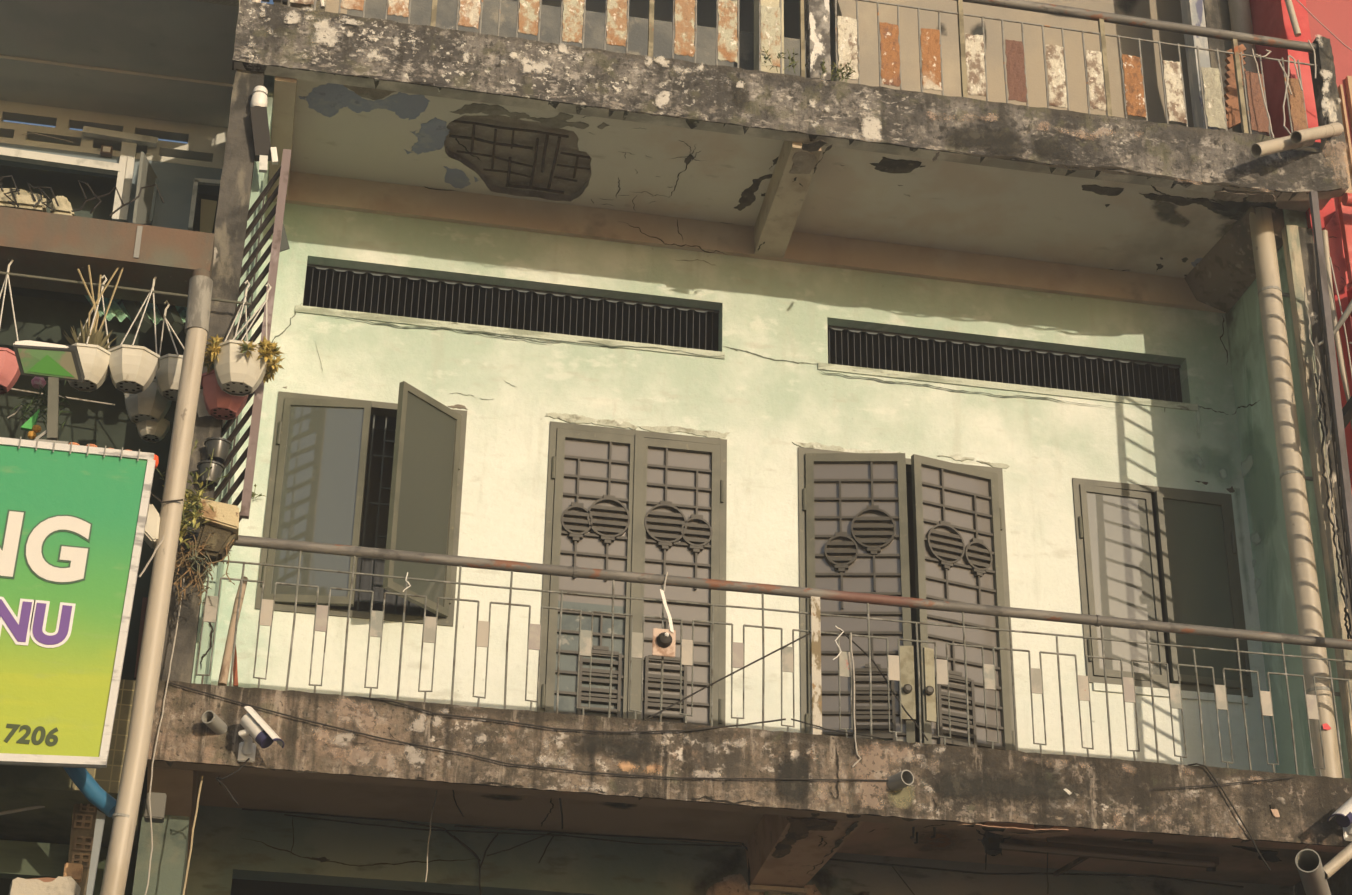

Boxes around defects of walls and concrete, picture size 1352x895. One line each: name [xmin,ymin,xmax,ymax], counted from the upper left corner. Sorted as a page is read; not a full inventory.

crack [346,73,454,87]
spalling [298,83,609,202]
crack [582,104,765,265]
spalling [734,99,882,211]
spalling [870,157,925,174]
damp [946,125,1070,161]
damp [576,733,660,780]
crack [686,796,765,804]
damp [776,758,810,802]
damp [934,772,1080,802]
crack [241,819,470,867]
spalling [772,813,861,858]